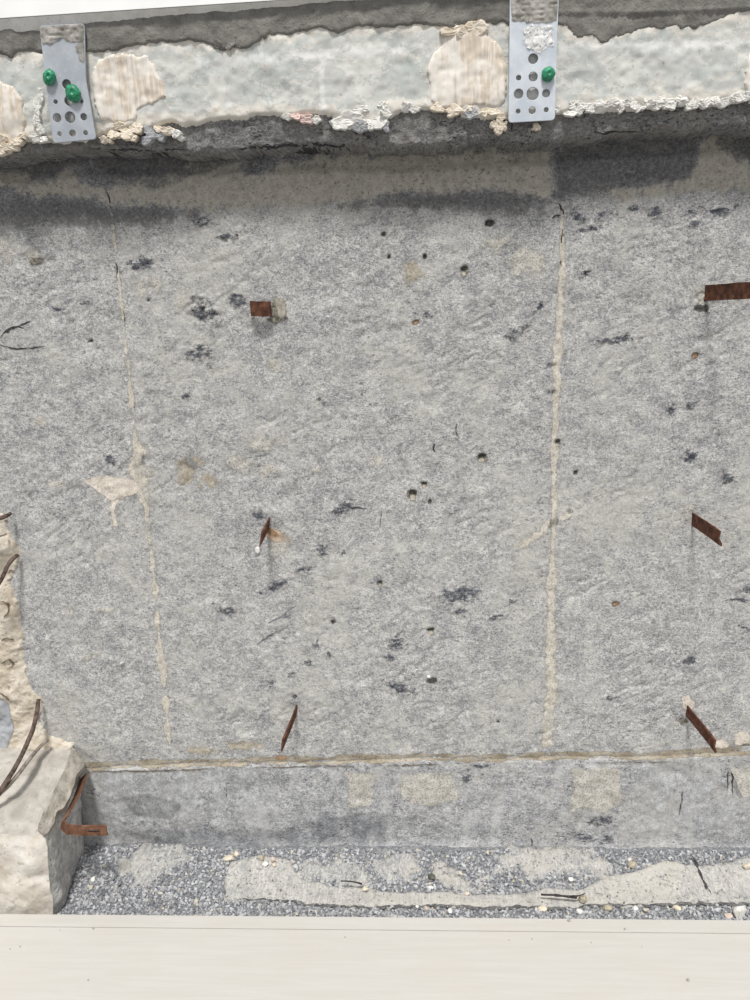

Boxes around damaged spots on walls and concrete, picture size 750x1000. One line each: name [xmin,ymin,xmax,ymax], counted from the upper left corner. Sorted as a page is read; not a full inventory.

flaking render [212,33,240,50]
flaking render [439,19,488,39]
flaking render [0,87,51,157]
flaking render [98,121,186,147]
flaking render [281,101,508,136]
flaking render [555,90,750,118]
crack [90,191,210,772]
crack [518,204,572,749]
spalling [0,513,74,751]